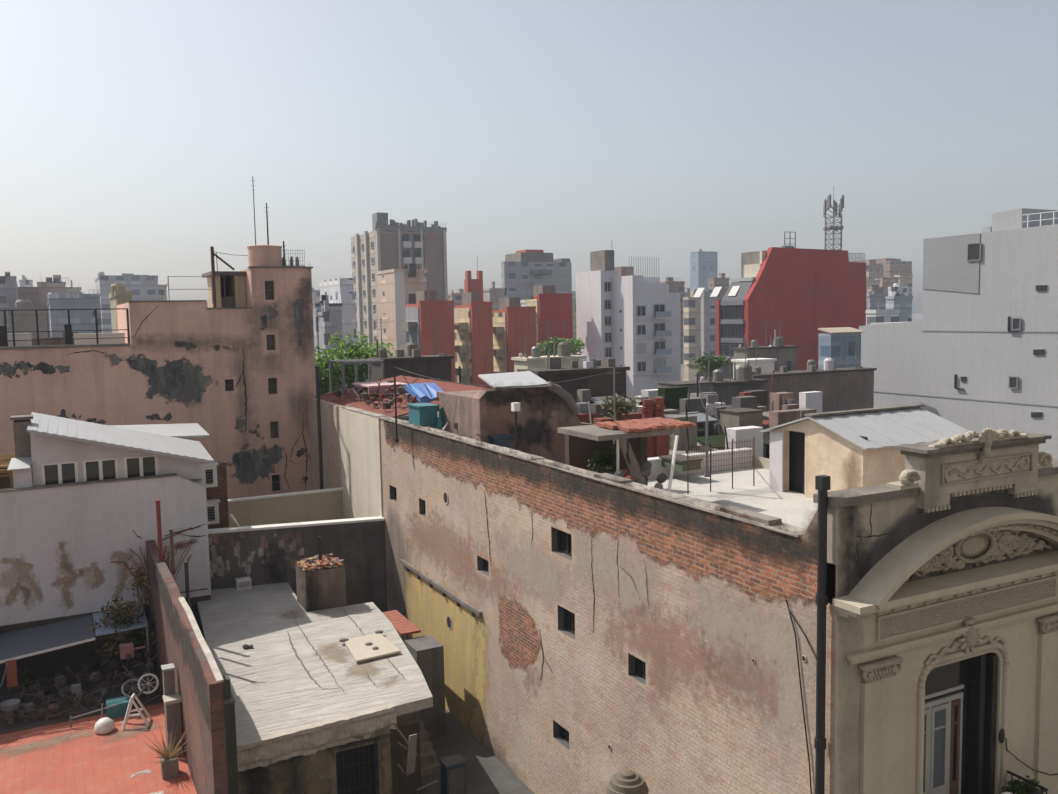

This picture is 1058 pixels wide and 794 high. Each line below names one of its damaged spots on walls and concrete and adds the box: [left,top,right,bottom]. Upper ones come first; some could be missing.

peeling [0,361,70,378]
peeling [124,341,218,422]
crack [235,348,247,436]
peeling [226,416,308,484]
flaking render [385,421,817,606]
crack [591,535,649,630]
crack [287,615,346,695]
crack [367,657,407,687]
spalling [498,597,541,669]